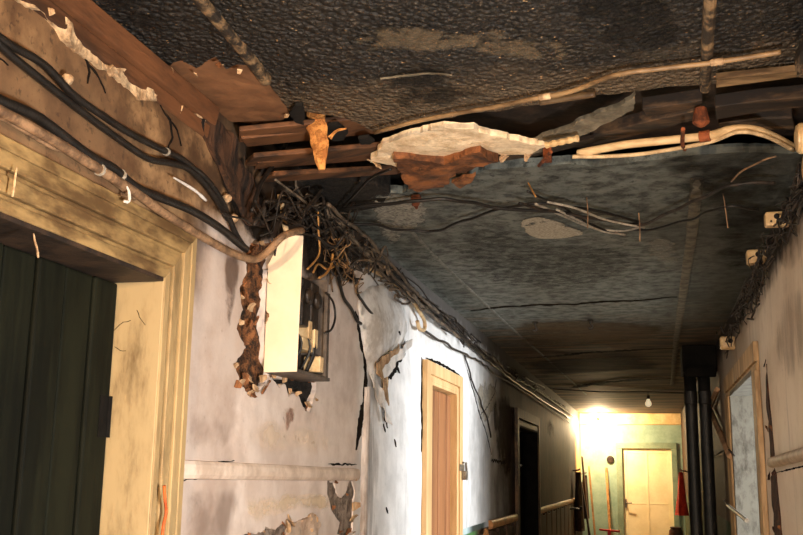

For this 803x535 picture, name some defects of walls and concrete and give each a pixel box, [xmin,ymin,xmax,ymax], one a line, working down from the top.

spalling [15,0,157,101]
peeling [367,91,635,169]
spalling [234,238,319,411]
crack [330,311,368,466]
crack [388,342,508,465]
peeling [244,514,295,535]
peeling [327,479,361,535]